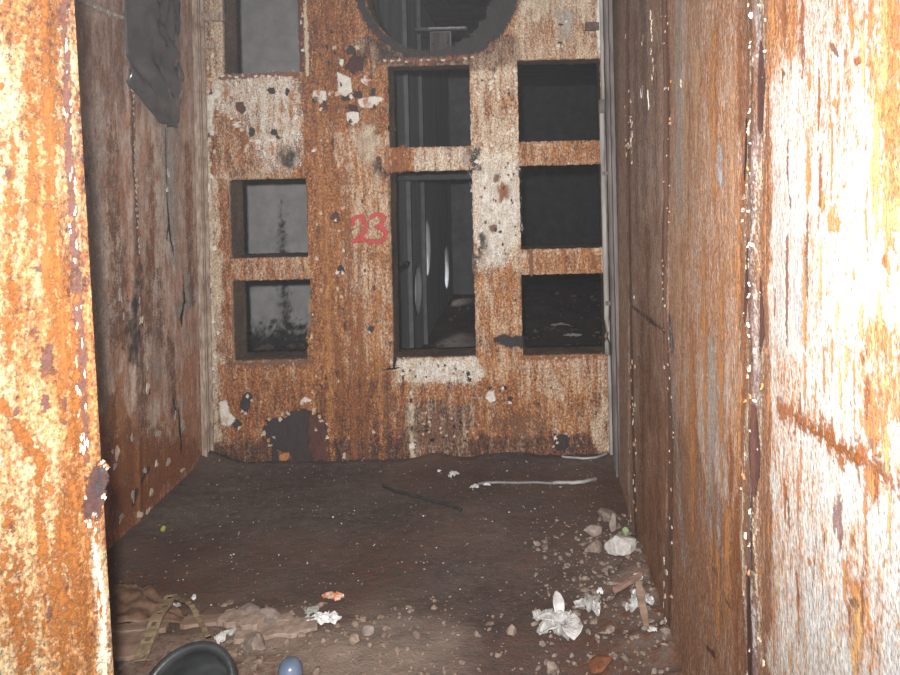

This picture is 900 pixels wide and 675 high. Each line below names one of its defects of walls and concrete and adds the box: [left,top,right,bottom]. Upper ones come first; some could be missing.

rust [0,0,95,675]
peeling [59,0,125,675]
rust [99,89,202,552]
crack [165,129,193,327]
peeling [206,53,317,443]
spalling [261,397,346,461]
rust [218,0,391,461]
peeling [312,44,384,189]
rust [383,54,474,65]
rust [493,173,510,203]
rust [632,0,742,675]
rust [764,0,900,675]